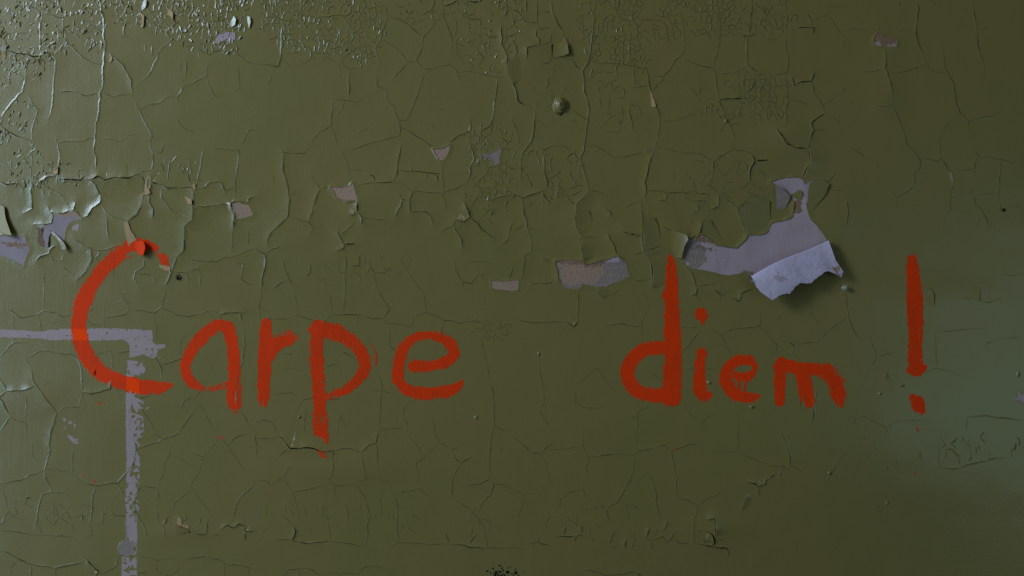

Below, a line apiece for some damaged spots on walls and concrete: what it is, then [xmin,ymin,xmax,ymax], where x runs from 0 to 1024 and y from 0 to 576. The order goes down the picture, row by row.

peeling [214,16,251,45]
peeling [226,196,259,222]
peeling [326,180,362,214]
peeling [0,205,84,270]
peeling [670,173,843,300]
crack [0,0,855,547]
peeling [550,253,634,295]
crack [937,414,1024,470]
crack [0,550,118,576]
crack [512,525,650,576]